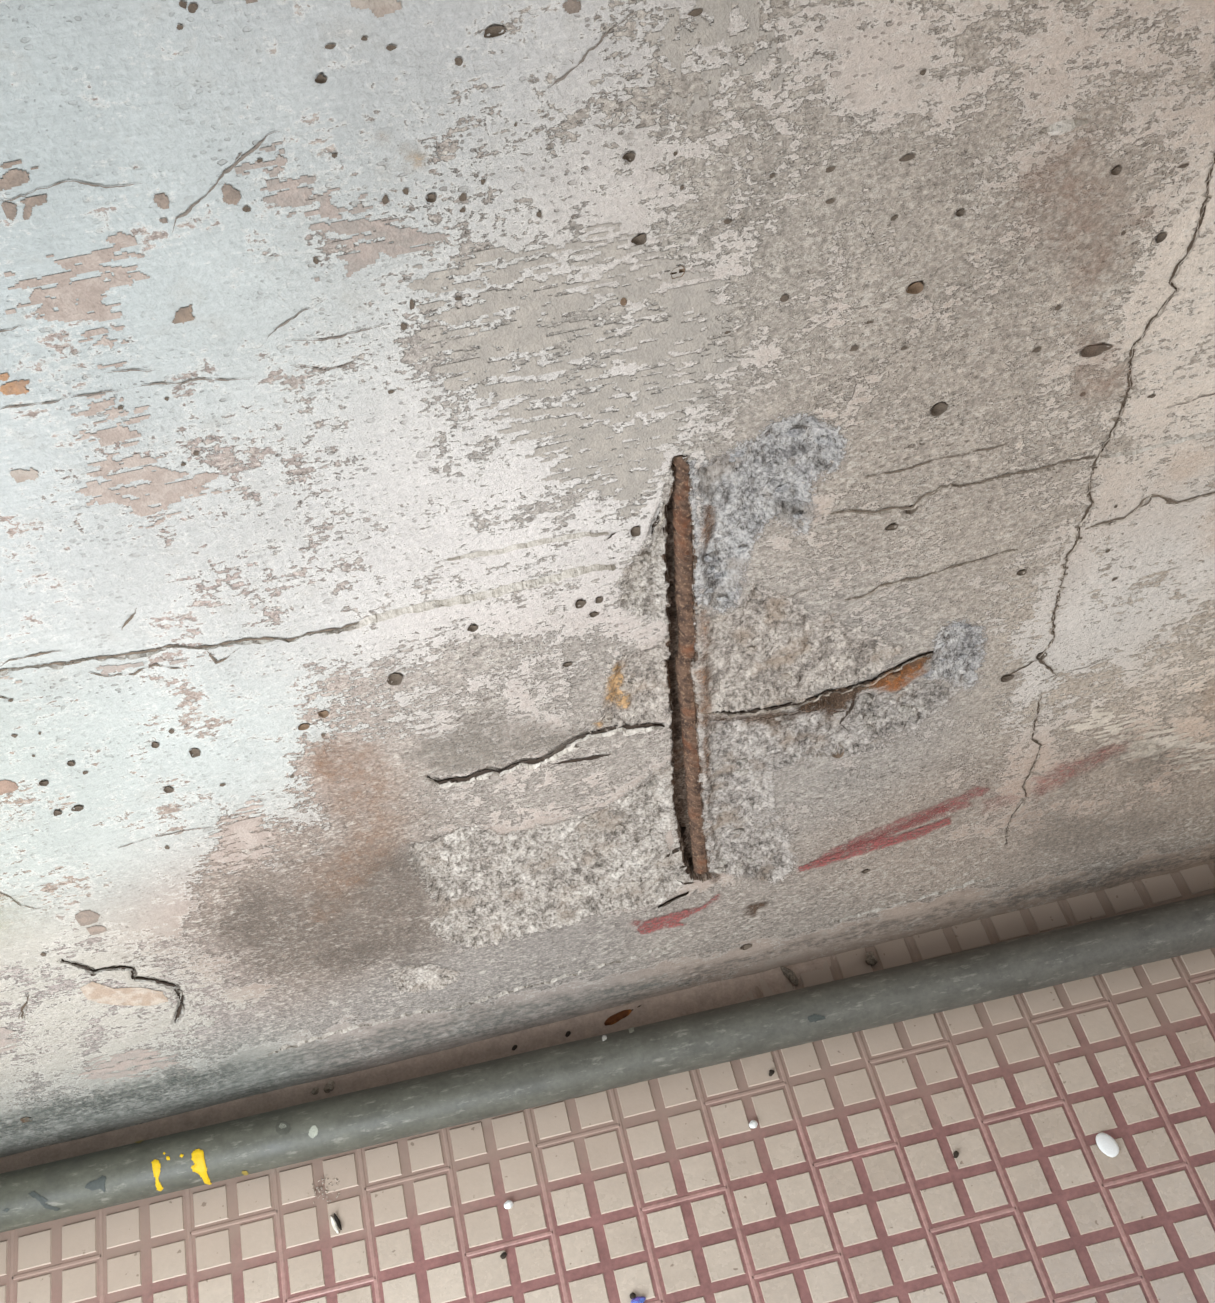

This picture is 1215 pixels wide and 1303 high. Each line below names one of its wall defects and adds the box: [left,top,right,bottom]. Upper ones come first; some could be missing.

peeling [0,160,47,221]
crack [827,153,1215,846]
peeling [221,142,988,949]
crack [0,608,359,699]
crack [701,651,933,730]
crack [427,723,665,788]
corrosion [746,903,766,918]
crack [60,959,186,1024]